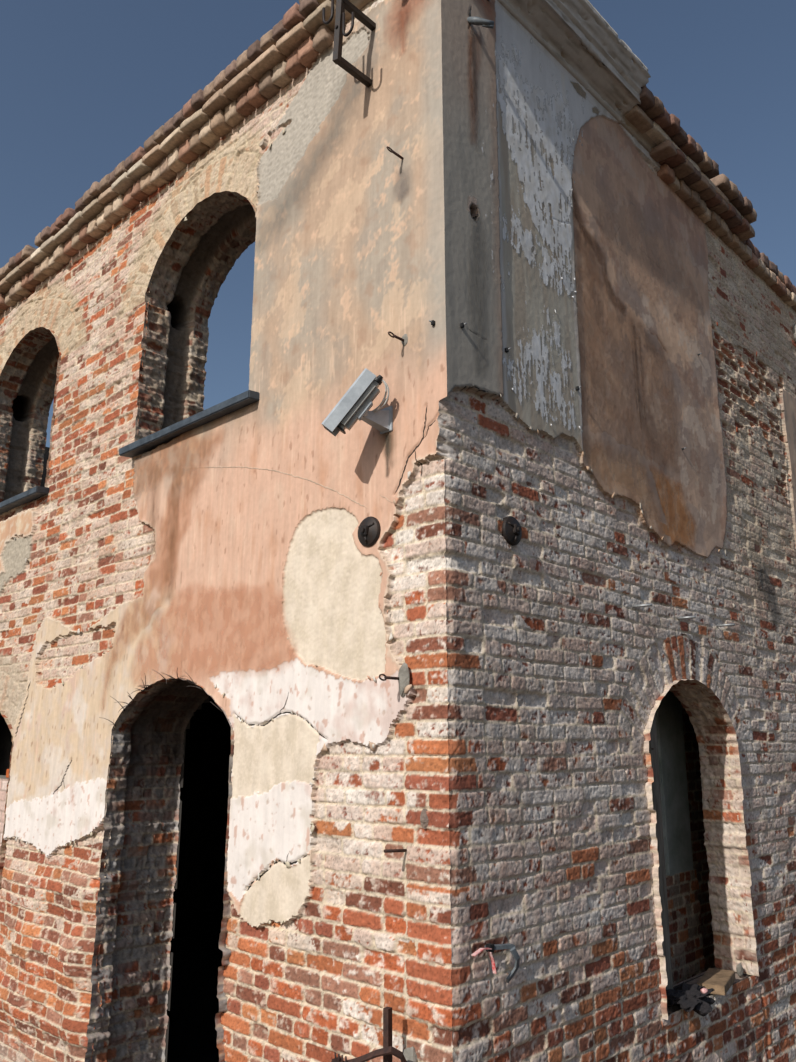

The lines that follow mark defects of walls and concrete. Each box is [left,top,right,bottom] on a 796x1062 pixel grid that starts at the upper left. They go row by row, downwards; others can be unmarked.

spalling [468,196,478,221]
peeling [485,40,599,299]
crack [395,407,442,493]
spalling [711,317,792,503]
spalling [35,622,116,689]
spalling [209,305,736,938]